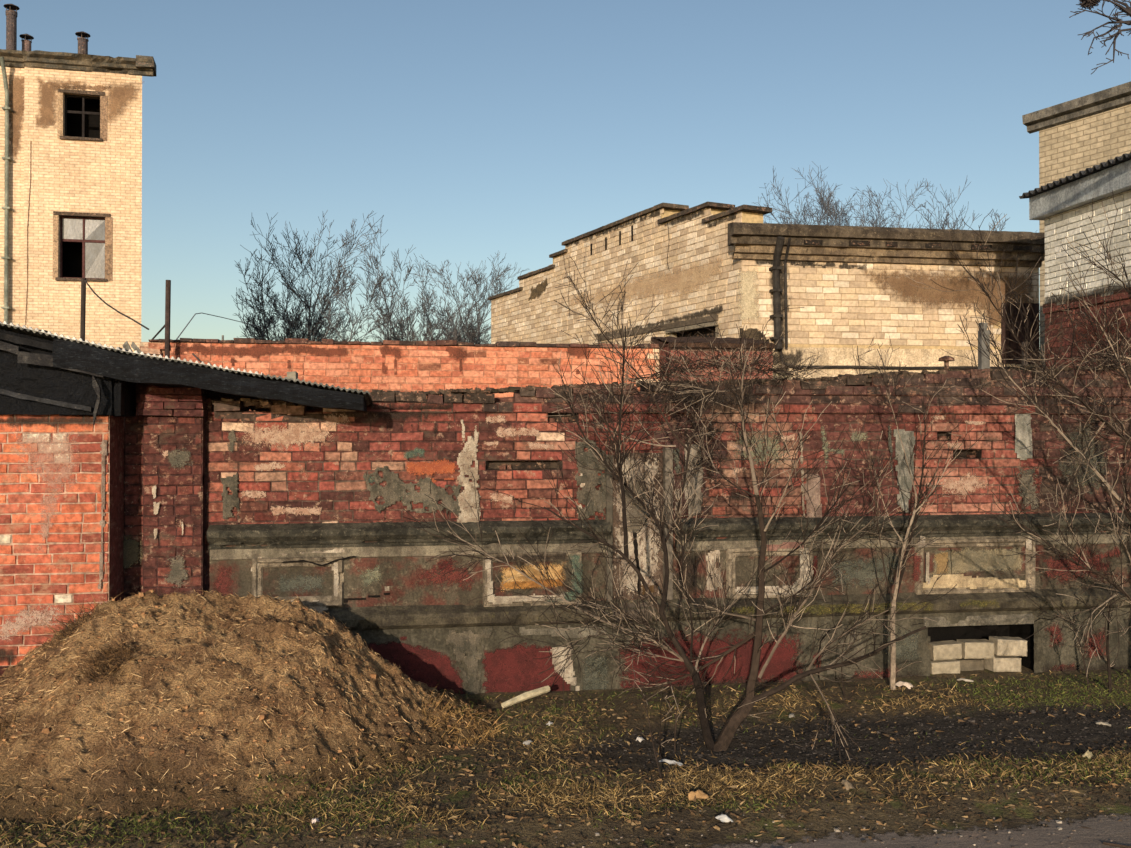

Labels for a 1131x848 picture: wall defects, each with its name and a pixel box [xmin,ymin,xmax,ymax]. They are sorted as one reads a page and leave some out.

water stain [108,84,136,119]
water stain [736,260,1130,380]
peeling [363,413,608,523]
peeling [152,486,160,539]
peeling [164,553,188,588]
peeling [366,625,607,694]
peeling [616,628,821,689]